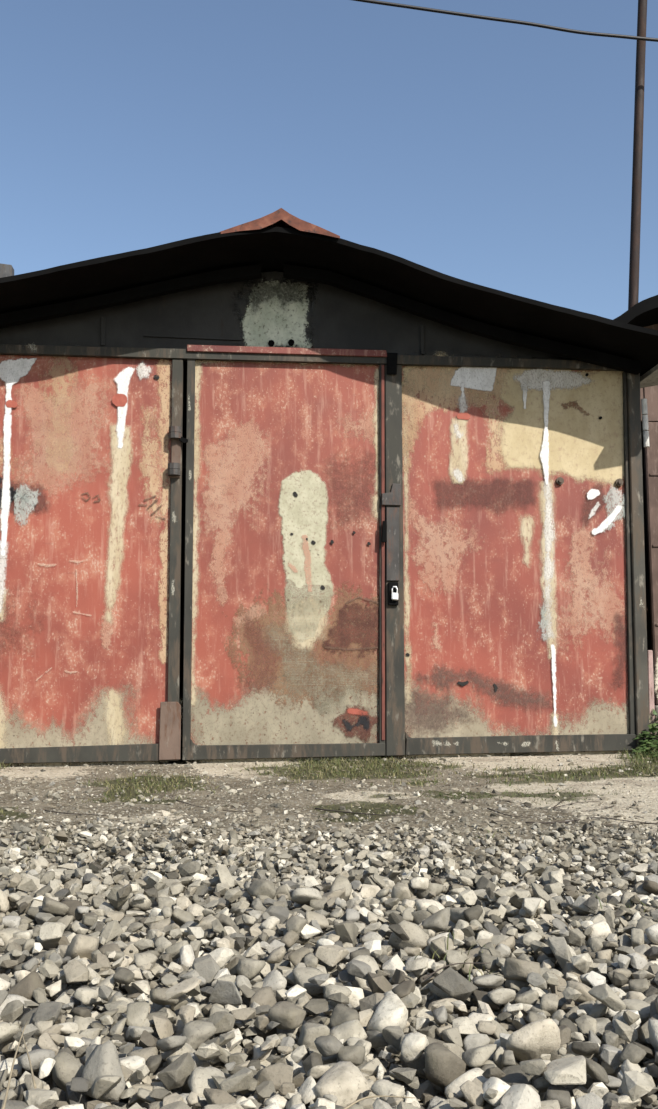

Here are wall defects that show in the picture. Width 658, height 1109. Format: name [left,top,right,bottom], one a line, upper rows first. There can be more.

peeling [182,470,379,745]
rust [323,596,379,658]
peeling [0,690,153,749]
rust [333,706,379,742]
peeling [399,686,658,759]